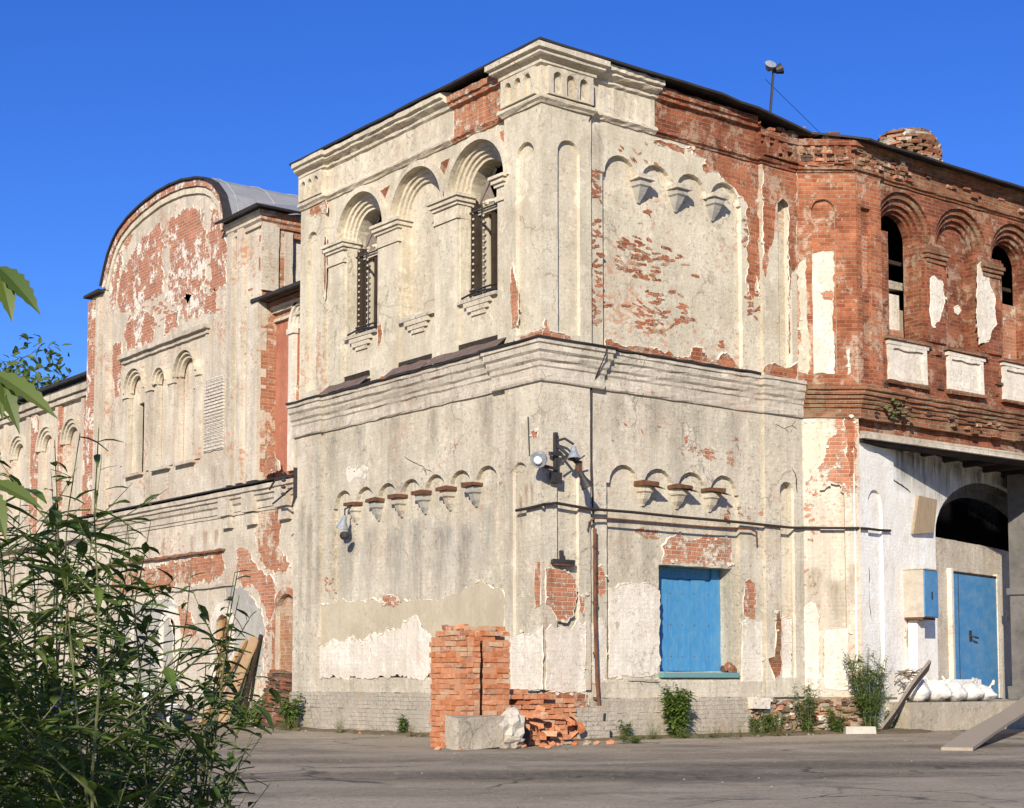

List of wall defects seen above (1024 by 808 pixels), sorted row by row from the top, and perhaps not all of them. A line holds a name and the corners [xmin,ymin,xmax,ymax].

spalling [591,169,604,204]
flaking render [108,205,237,398]
flaking render [510,258,572,341]
spalling [591,209,745,369]
flaking render [618,127,931,379]
spalling [929,276,961,328]
spalling [976,262,997,344]
flaking render [802,410,860,542]
flaking render [110,508,291,698]
flaking render [319,561,661,708]
flaking render [635,527,735,567]
flaking render [741,569,853,692]